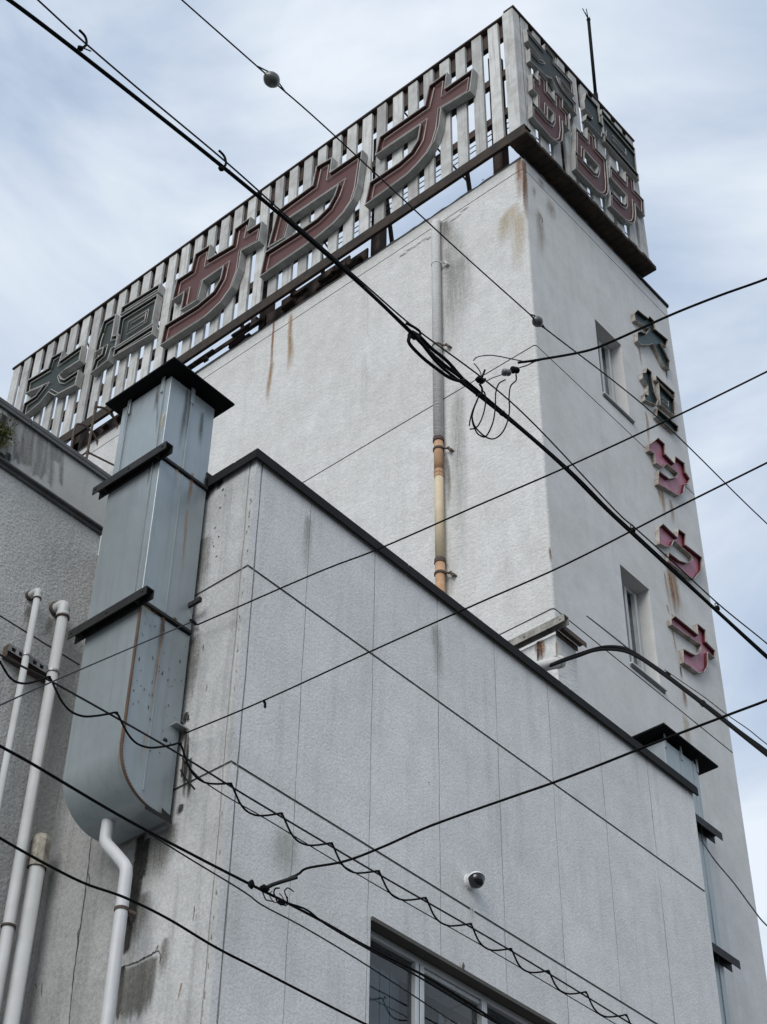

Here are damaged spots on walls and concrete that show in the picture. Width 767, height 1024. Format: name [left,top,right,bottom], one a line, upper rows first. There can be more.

corrosion [517,159,528,201]
damp [116,737,192,1018]